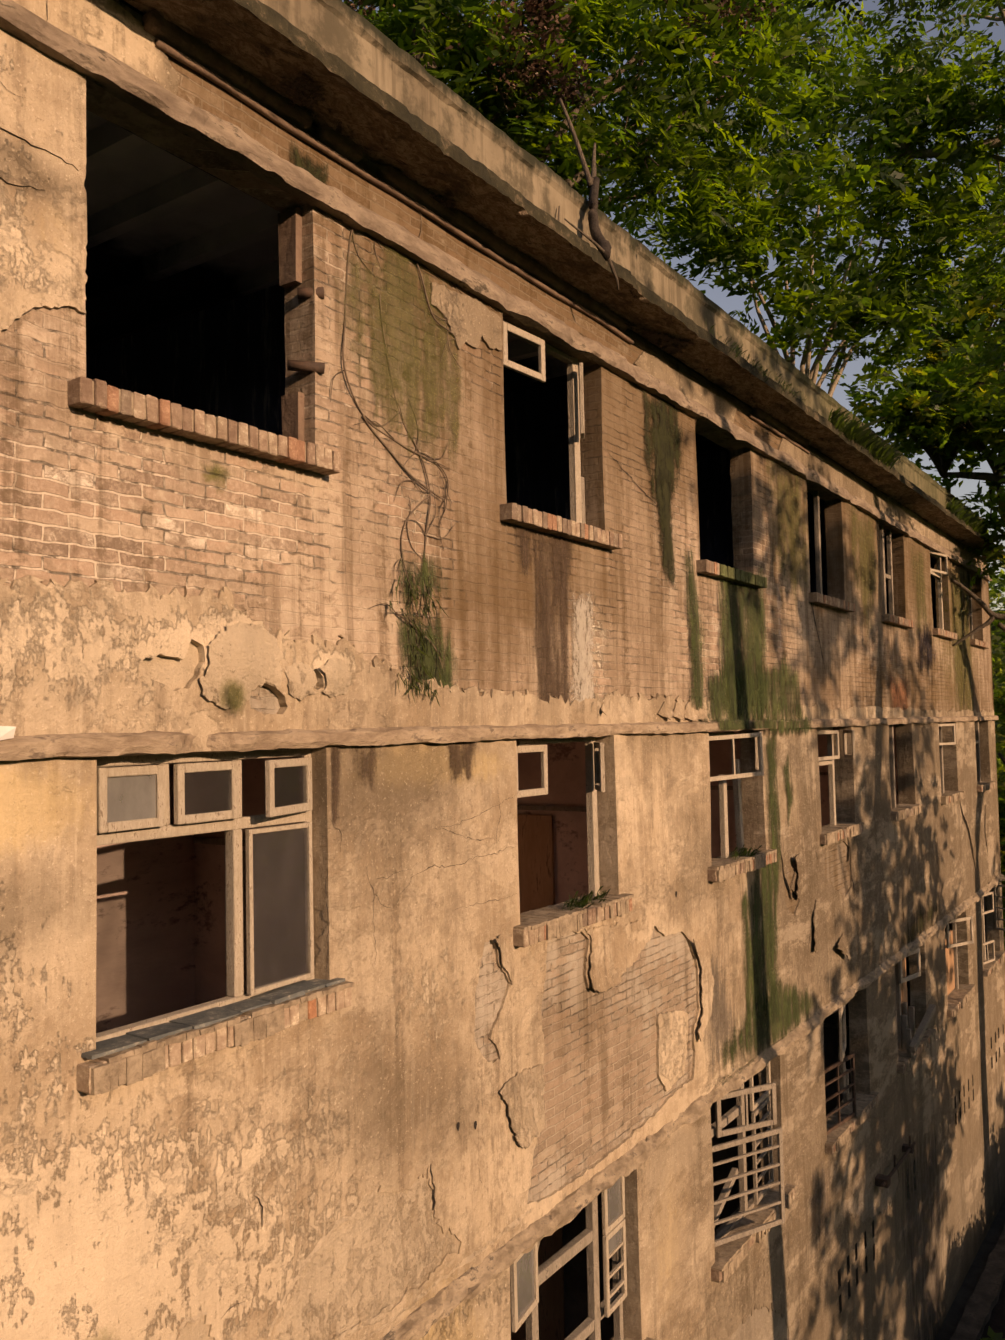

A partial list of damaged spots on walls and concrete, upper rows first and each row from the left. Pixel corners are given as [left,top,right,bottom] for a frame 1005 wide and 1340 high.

crack [0,84,81,190]
flaking render [0,305,369,638]
peeling [0,726,16,740]
flaking render [142,639,205,691]
flaking render [249,683,288,715]
flaking render [313,669,324,690]
damp [516,528,594,705]
damp [710,959,733,1065]
flaking render [268,920,715,1340]